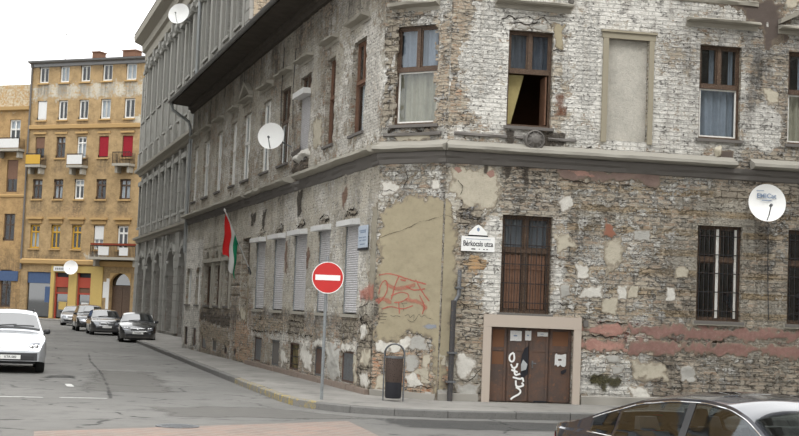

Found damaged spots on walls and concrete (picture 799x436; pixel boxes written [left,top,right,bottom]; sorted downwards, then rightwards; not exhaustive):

crack [501,15,552,34]
spalling [380,171,408,197]
spalling [432,165,504,230]
peeling [558,195,574,213]
peeling [554,232,578,254]
rust [492,329,505,364]
rust [552,332,568,347]
water stain [589,374,621,392]